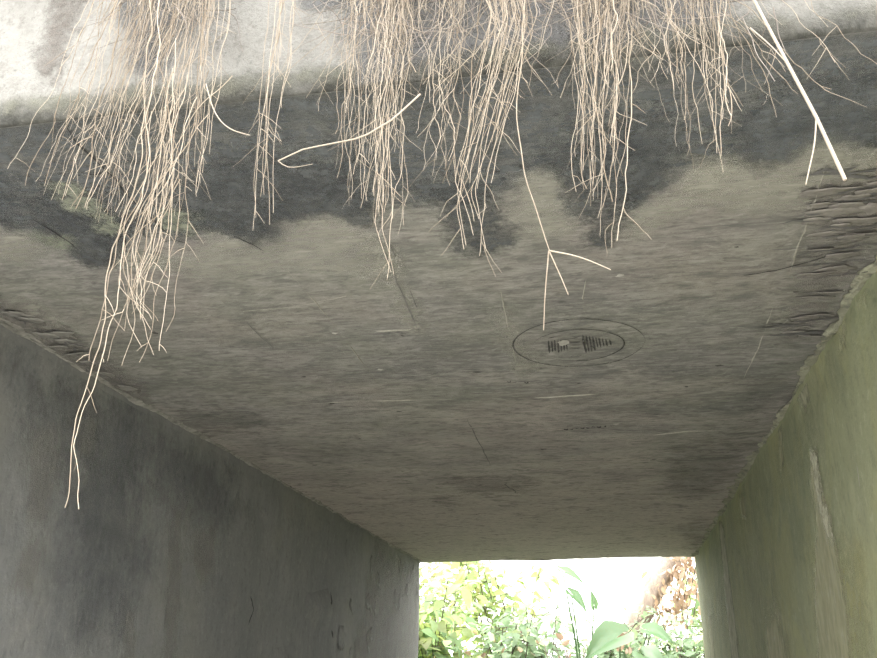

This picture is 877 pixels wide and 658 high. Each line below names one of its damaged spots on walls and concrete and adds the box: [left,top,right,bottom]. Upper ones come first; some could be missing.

crack [64,123,190,245]
water stain [0,35,877,282]
peeling [759,166,877,337]
peeling [0,295,148,395]